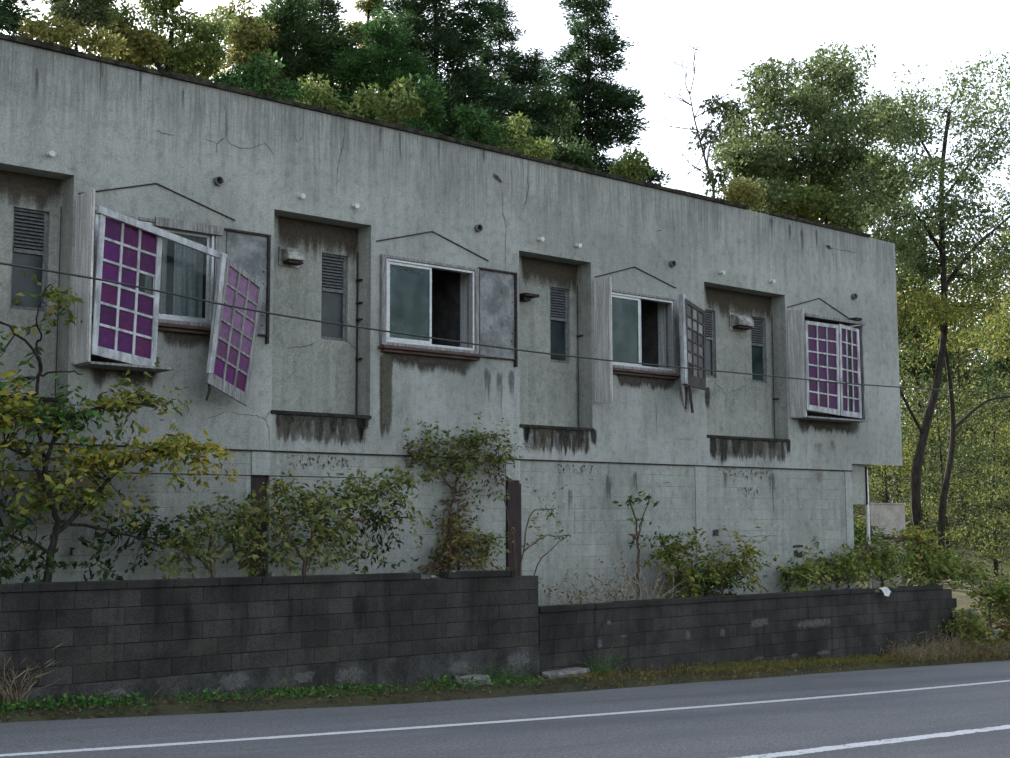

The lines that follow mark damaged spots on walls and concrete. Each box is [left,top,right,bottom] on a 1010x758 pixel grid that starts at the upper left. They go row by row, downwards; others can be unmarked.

crack [206,98,273,153]
water stain [276,352,473,469]
water stain [485,369,514,401]
water stain [524,428,597,475]
water stain [710,438,791,499]